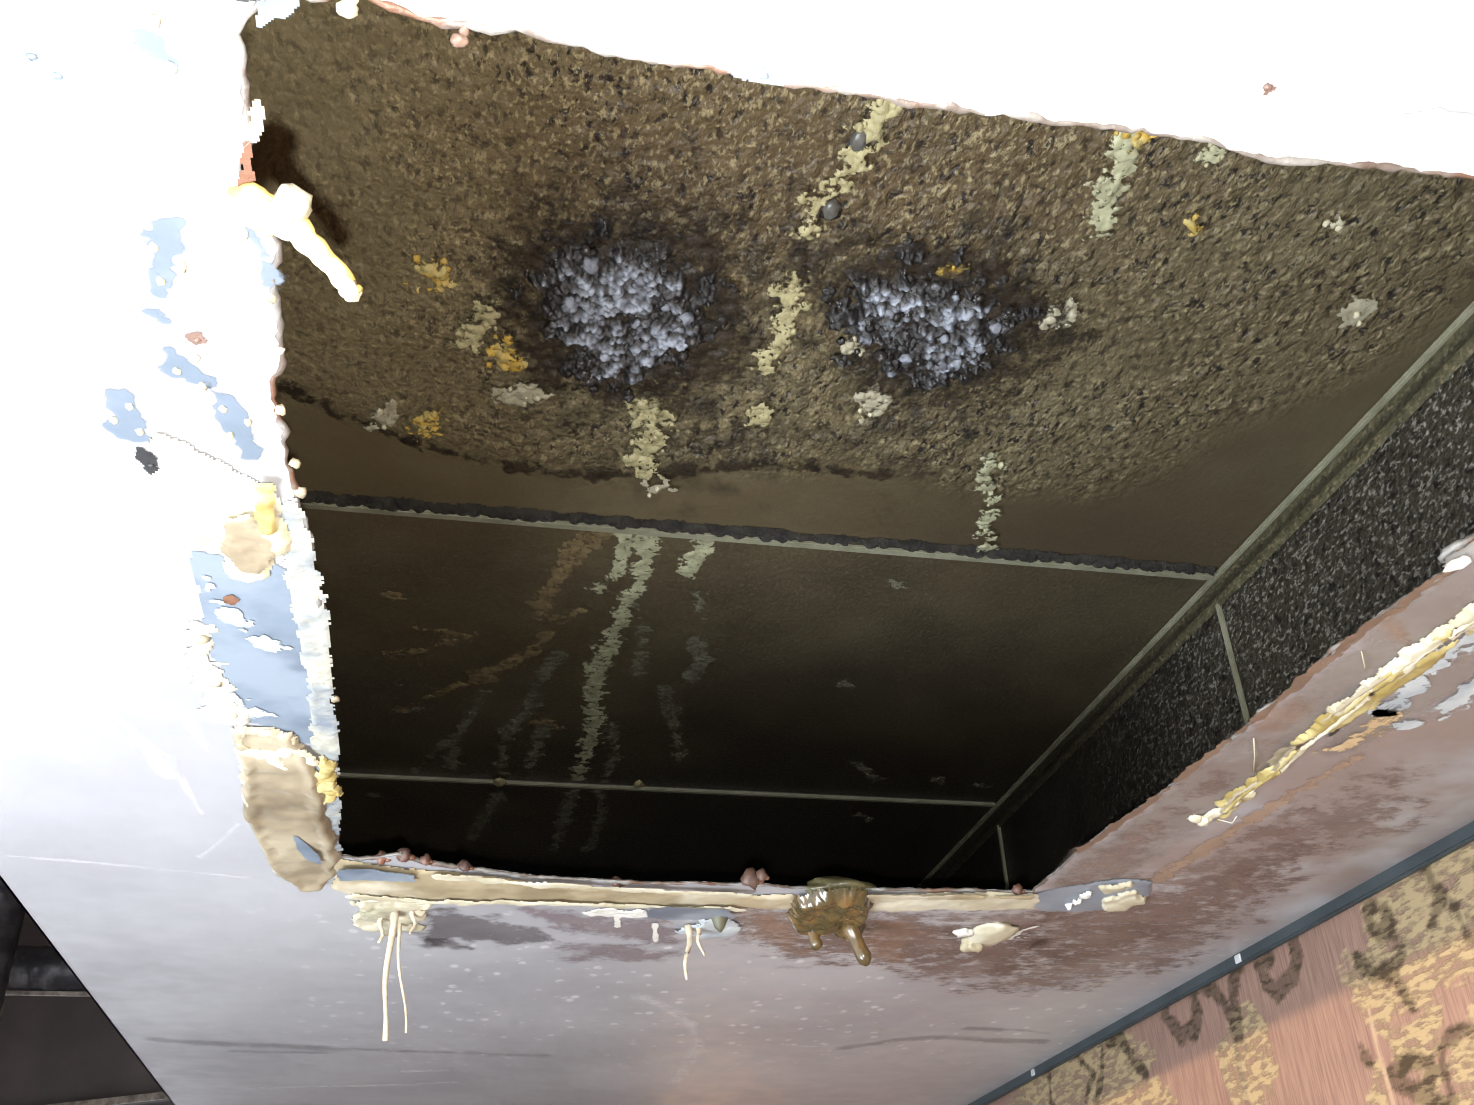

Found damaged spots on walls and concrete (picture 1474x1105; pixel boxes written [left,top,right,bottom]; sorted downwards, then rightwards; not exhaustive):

peeling [140,217,263,460]
peeling [237,225,284,304]
peeling [274,404,286,416]
peeling [288,458,307,499]
peeling [189,551,344,806]
water stain [380,530,717,853]
peeling [1062,564,1474,886]
peeling [952,928,983,953]